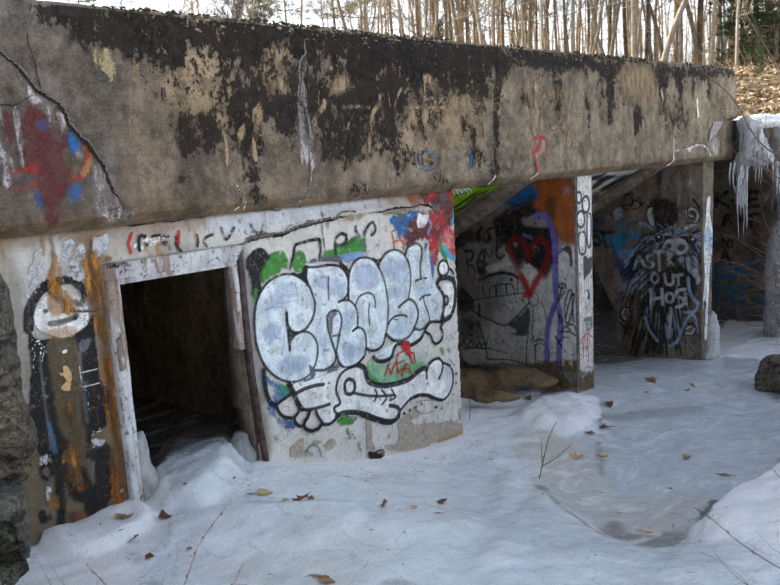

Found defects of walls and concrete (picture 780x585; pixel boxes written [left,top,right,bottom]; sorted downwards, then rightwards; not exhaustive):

water stain [0,119,24,187]
crack [0,29,207,227]
water stain [28,3,735,211]
peeling [290,438,336,458]
peeling [358,408,463,459]